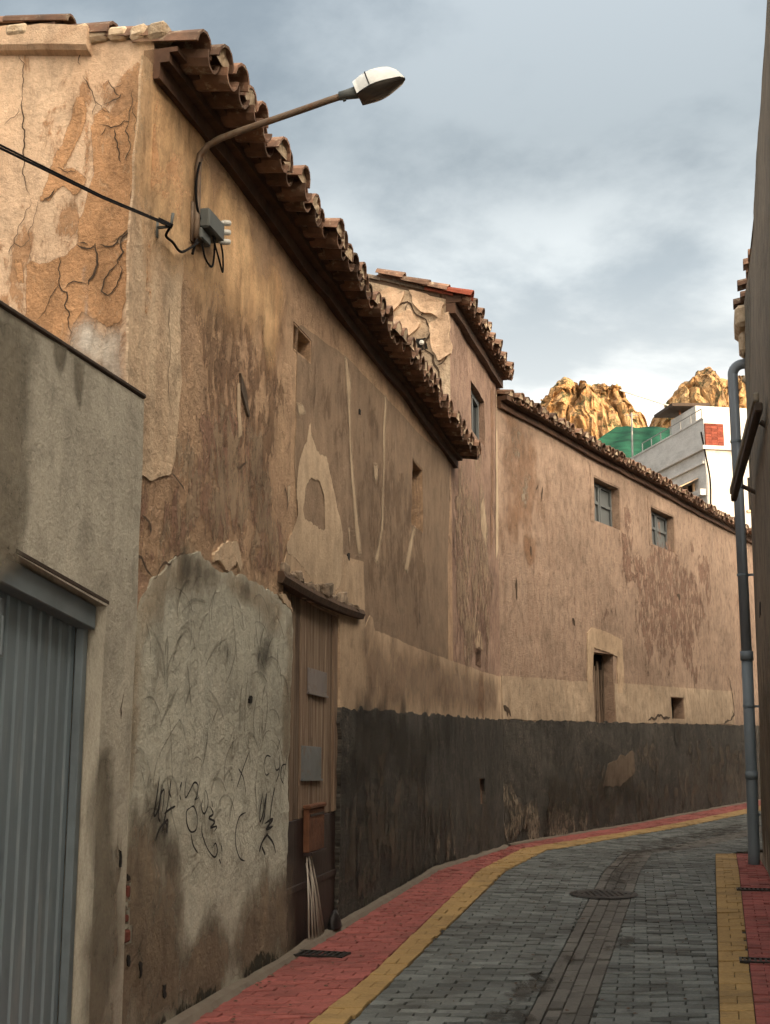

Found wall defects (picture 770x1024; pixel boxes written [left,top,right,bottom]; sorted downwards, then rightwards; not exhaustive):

crack [4,58,76,265]
peeling [0,62,140,371]
crack [78,55,137,162]
crack [37,230,128,341]
water stain [55,324,119,403]
peeling [381,287,453,361]
peeling [602,751,635,788]
water stain [83,753,291,1024]